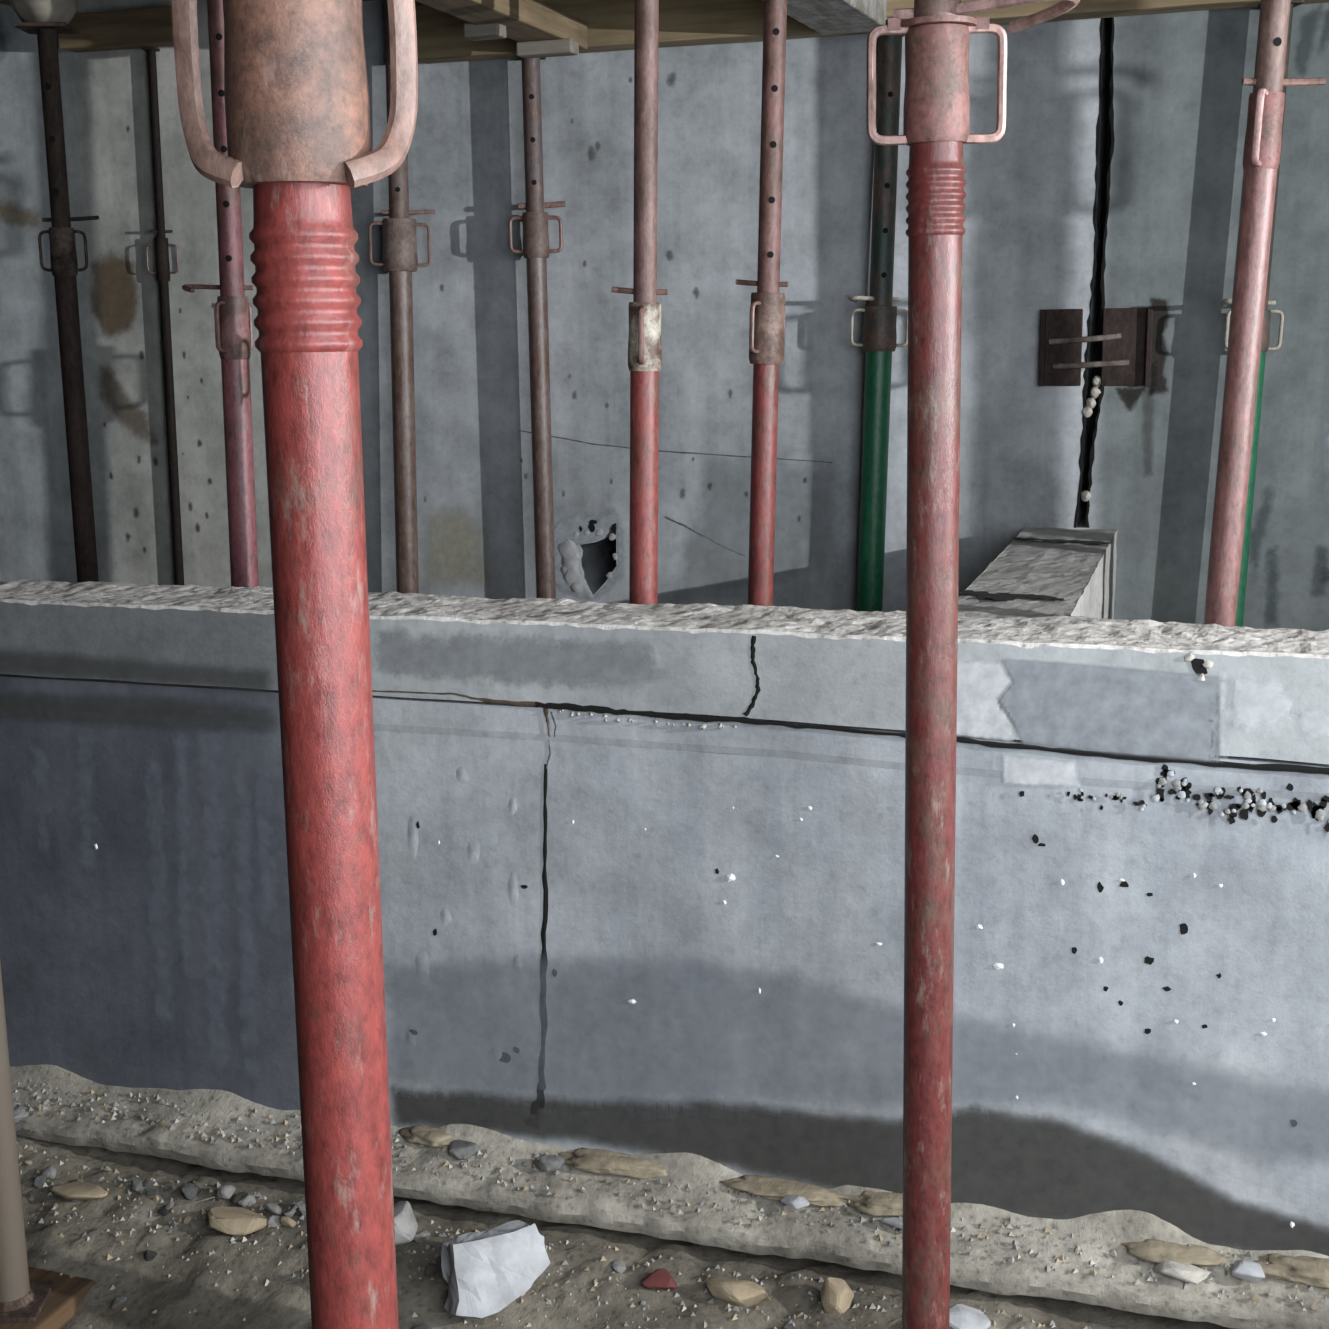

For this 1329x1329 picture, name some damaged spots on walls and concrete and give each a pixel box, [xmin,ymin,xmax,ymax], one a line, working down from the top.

spalling [558,520,618,596]
crack [956,736,1329,775]
crack [372,636,905,1115]